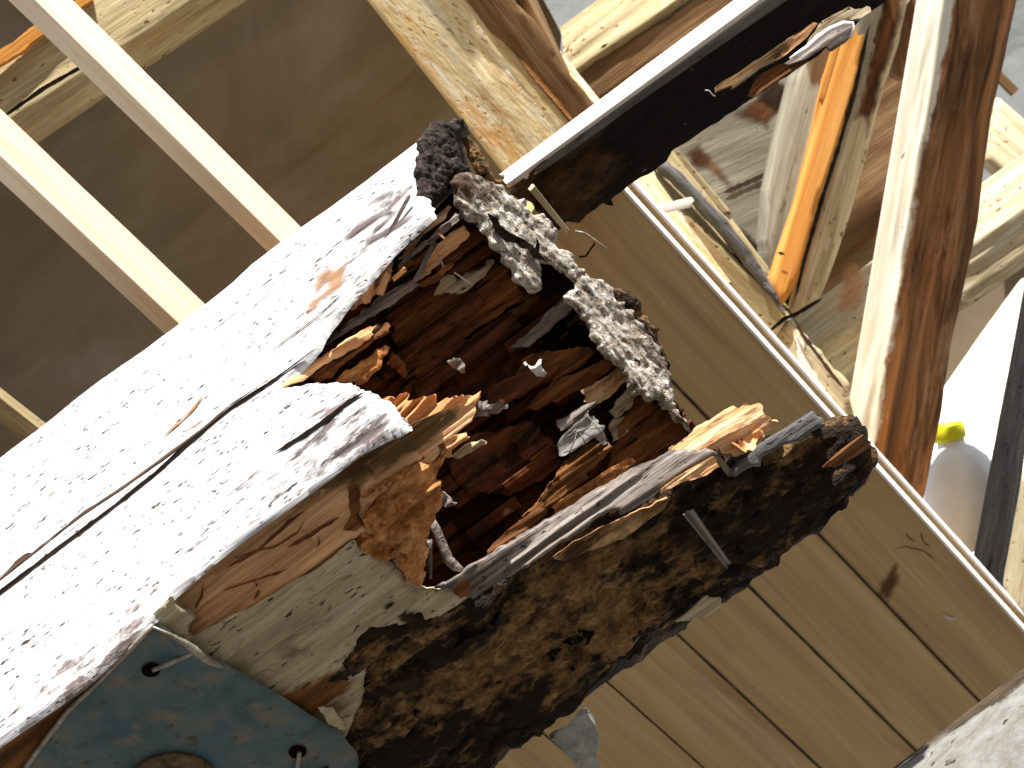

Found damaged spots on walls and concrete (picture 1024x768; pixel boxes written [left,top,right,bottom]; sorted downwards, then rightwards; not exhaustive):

crack [5,67,80,116]
peeling [794,334,832,398]
crack [0,291,345,594]
crack [272,392,364,454]
crack [334,454,379,478]
spalling [343,485,364,531]
crack [195,511,364,610]
peeling [453,579,471,599]
water stain [881,568,897,598]